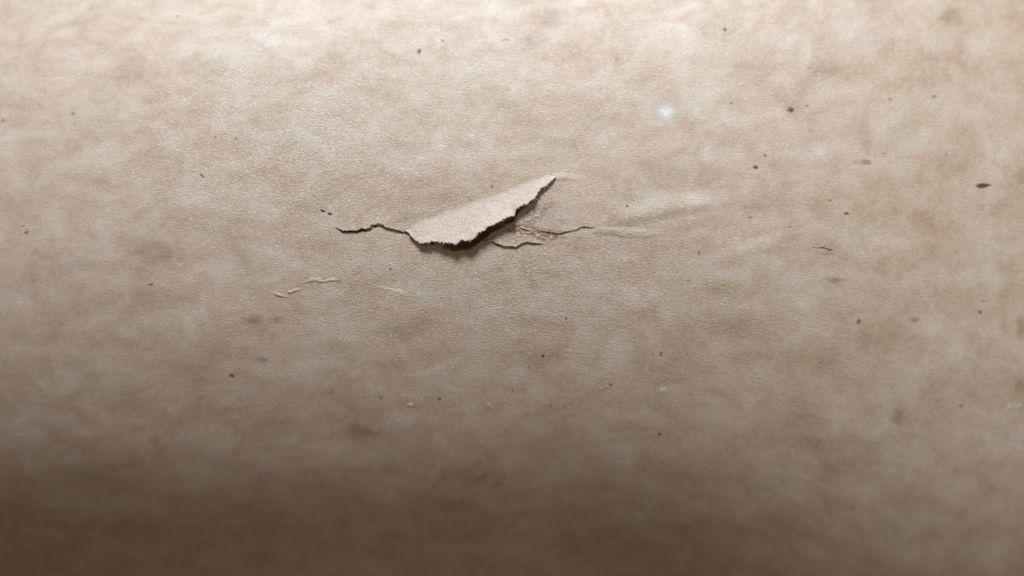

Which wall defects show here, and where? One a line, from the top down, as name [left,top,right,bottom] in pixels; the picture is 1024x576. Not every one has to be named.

crack [336,223,407,235]
peeling [482,231,546,247]
crack [483,227,593,248]